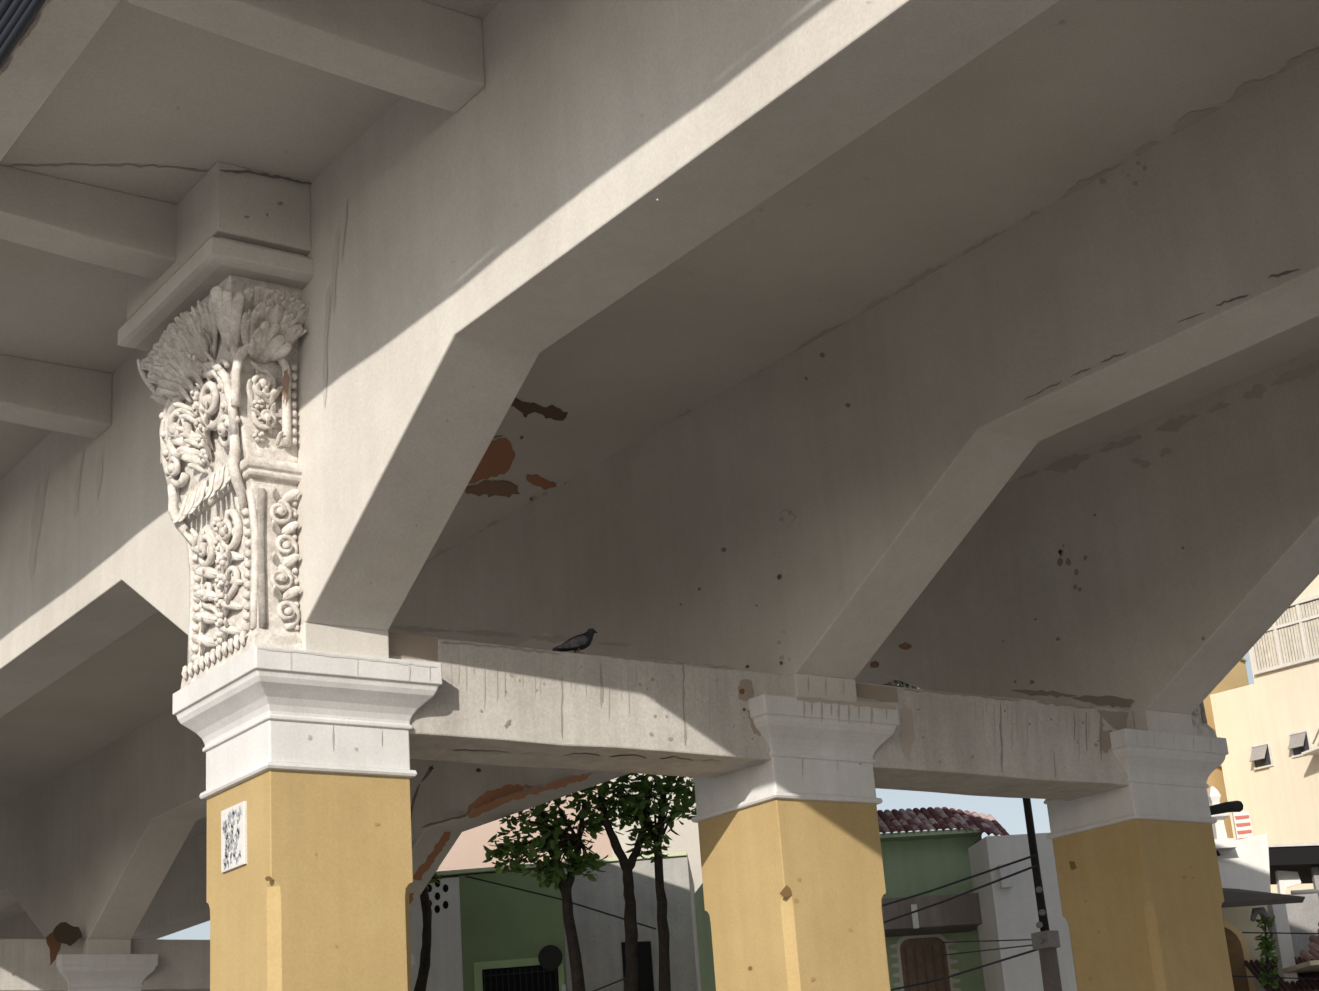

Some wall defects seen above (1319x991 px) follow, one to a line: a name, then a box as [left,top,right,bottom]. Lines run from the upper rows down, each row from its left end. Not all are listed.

crack [8,163,312,184]
peeling [511,397,568,421]
peeling [465,436,565,501]
damp [389,626,737,741]
crack [411,765,467,845]
spalling [464,773,592,818]
spalling [409,832,451,904]